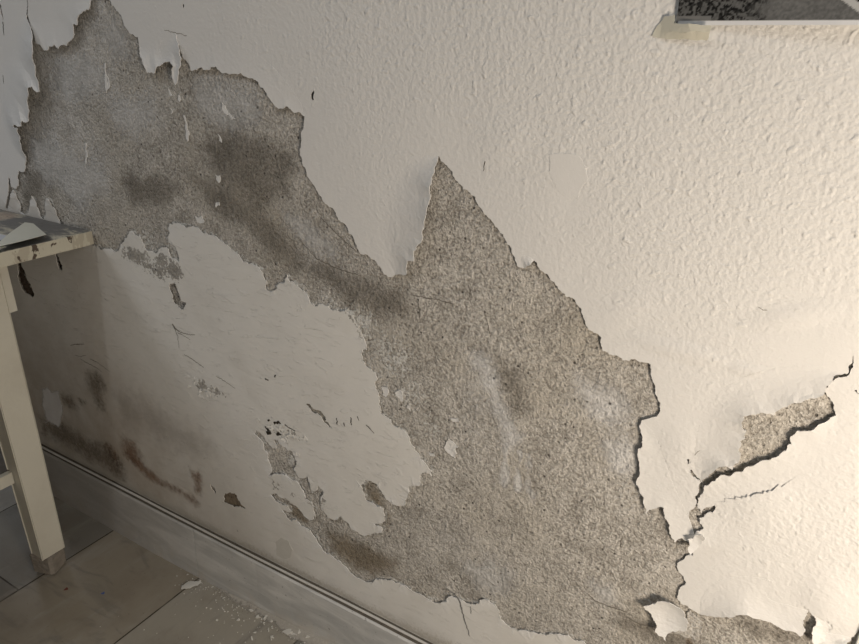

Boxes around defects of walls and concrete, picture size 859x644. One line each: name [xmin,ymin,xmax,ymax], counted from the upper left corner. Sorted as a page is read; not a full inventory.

peeling [30,0,91,50]
peeling [1,14,40,160]
water stain [32,140,107,206]
peeling [382,156,439,275]
flaking render [19,263,34,297]
flaking render [122,246,184,280]
peeling [691,360,854,498]
peeling [211,486,245,508]
peeling [636,421,703,542]
peeling [643,601,688,641]
peeling [671,609,703,640]
peeling [812,616,859,644]